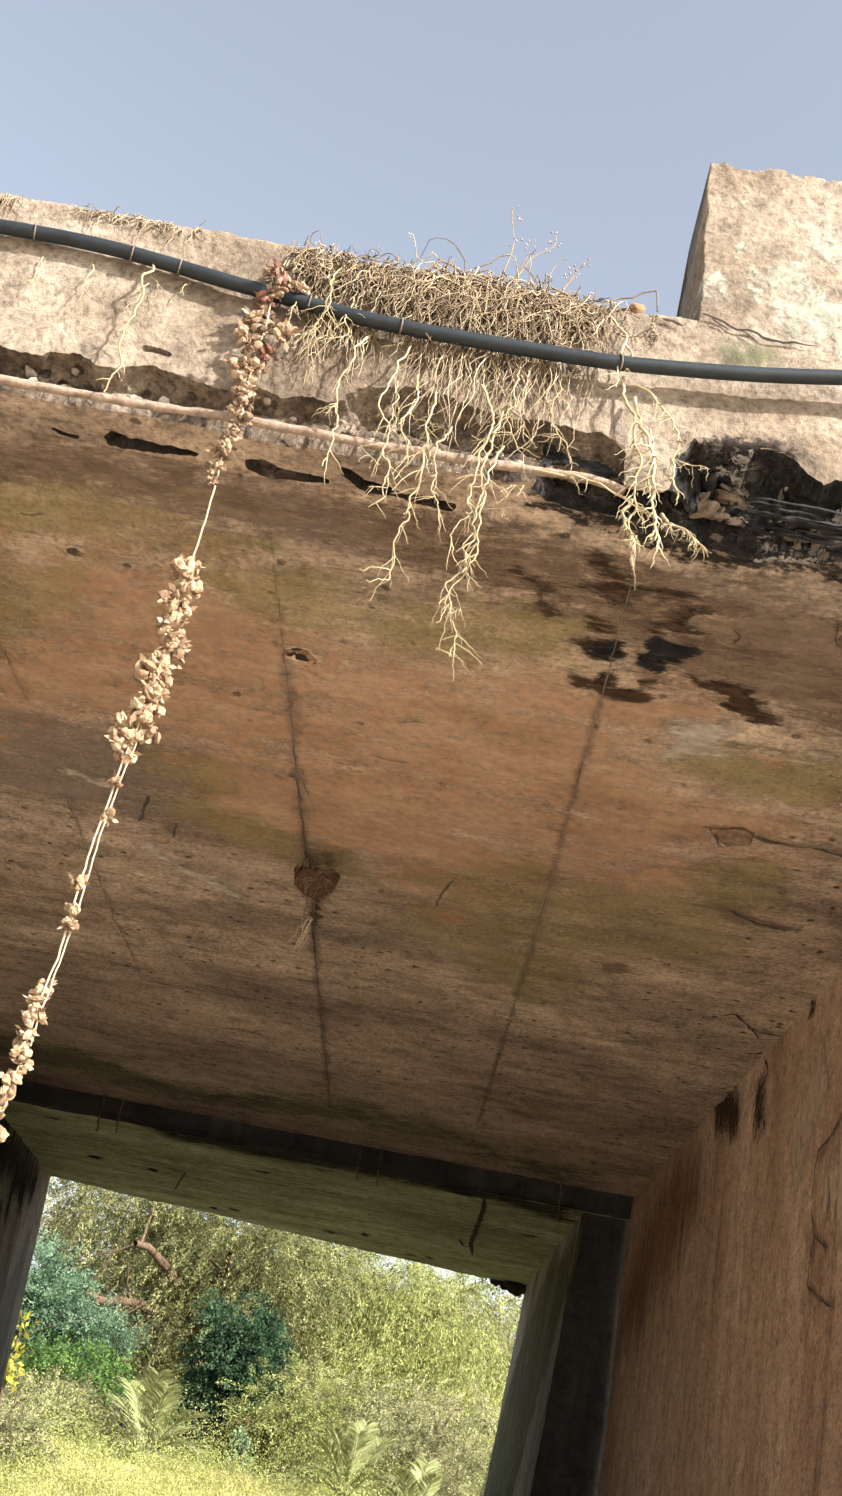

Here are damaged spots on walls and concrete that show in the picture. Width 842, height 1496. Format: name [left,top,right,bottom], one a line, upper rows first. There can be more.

crack [268,524,330,1113]
spalling [0,345,842,566]
water stain [0,436,842,768]
crack [471,555,651,1145]